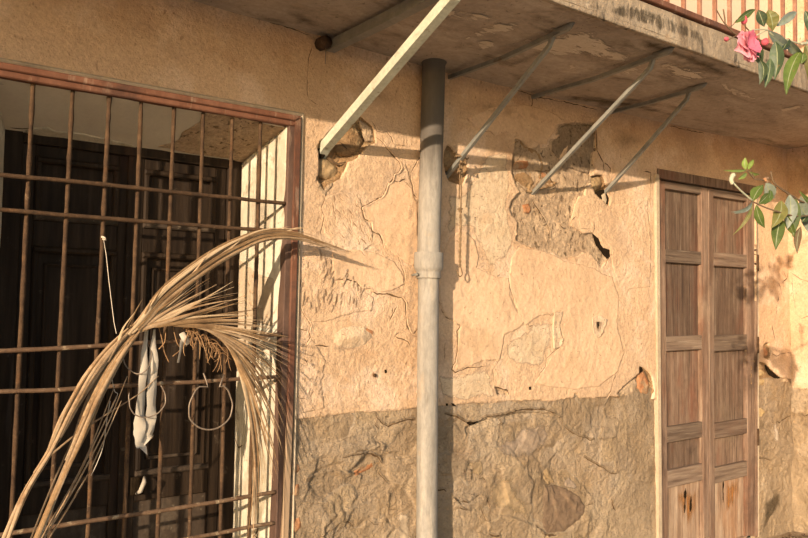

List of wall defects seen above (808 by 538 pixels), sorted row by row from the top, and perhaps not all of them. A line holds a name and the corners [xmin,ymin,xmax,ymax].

flaking render [299,117,418,322]
crack [334,119,420,347]
flaking render [439,105,654,400]
crack [439,301,499,385]
flaking render [751,343,788,386]
crack [444,406,620,474]
flaking render [542,468,585,533]